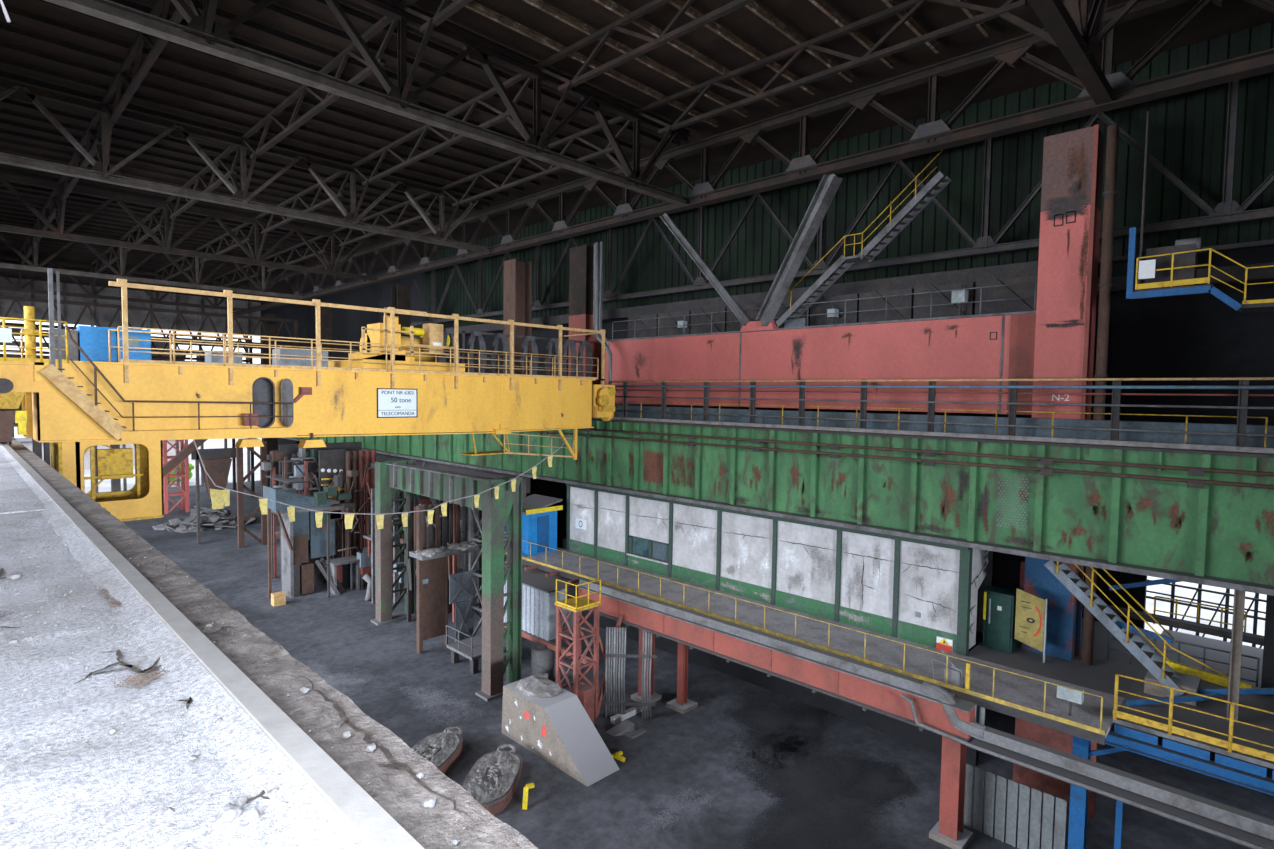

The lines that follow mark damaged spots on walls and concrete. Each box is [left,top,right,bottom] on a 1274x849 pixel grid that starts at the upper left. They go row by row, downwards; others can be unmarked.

rust [1067,217,1090,323]
rust [939,479,961,531]
rust [1061,489,1107,553]
rust [1125,497,1186,535]
rust [1235,508,1274,563]
crack [573,504,984,633]